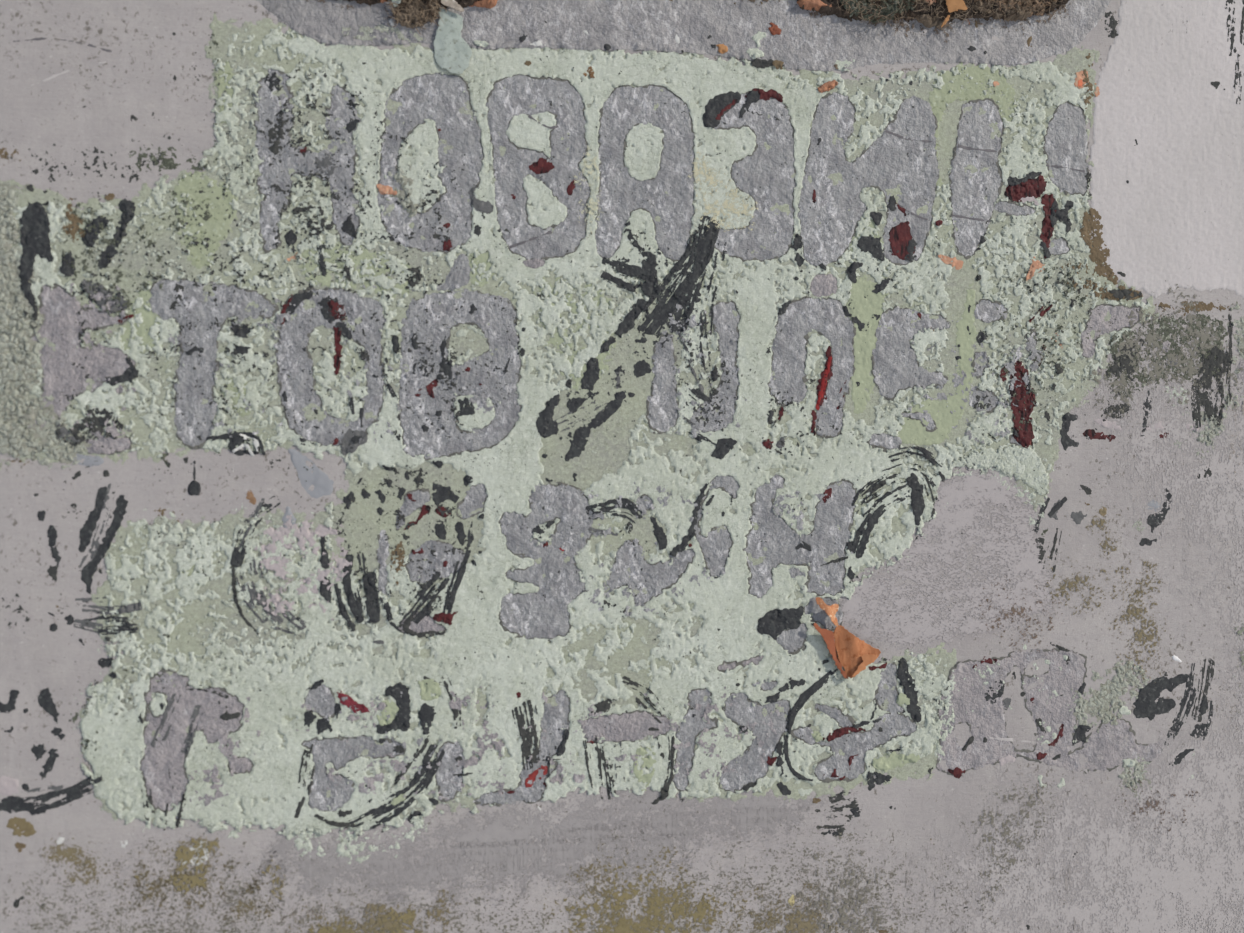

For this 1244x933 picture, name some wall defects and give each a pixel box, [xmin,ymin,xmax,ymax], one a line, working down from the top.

peeling [1211,0,1244,104]
peeling [498,104,567,233]
peeling [624,122,664,181]
peeling [1083,404,1127,442]
peeling [37,510,61,582]
peeling [1034,528,1062,569]
peeling [1132,488,1172,546]
leakage [6,284,1244,933]
peeling [0,690,28,713]
peeling [38,687,65,740]
peeling [1012,642,1219,760]
peeling [31,744,59,780]